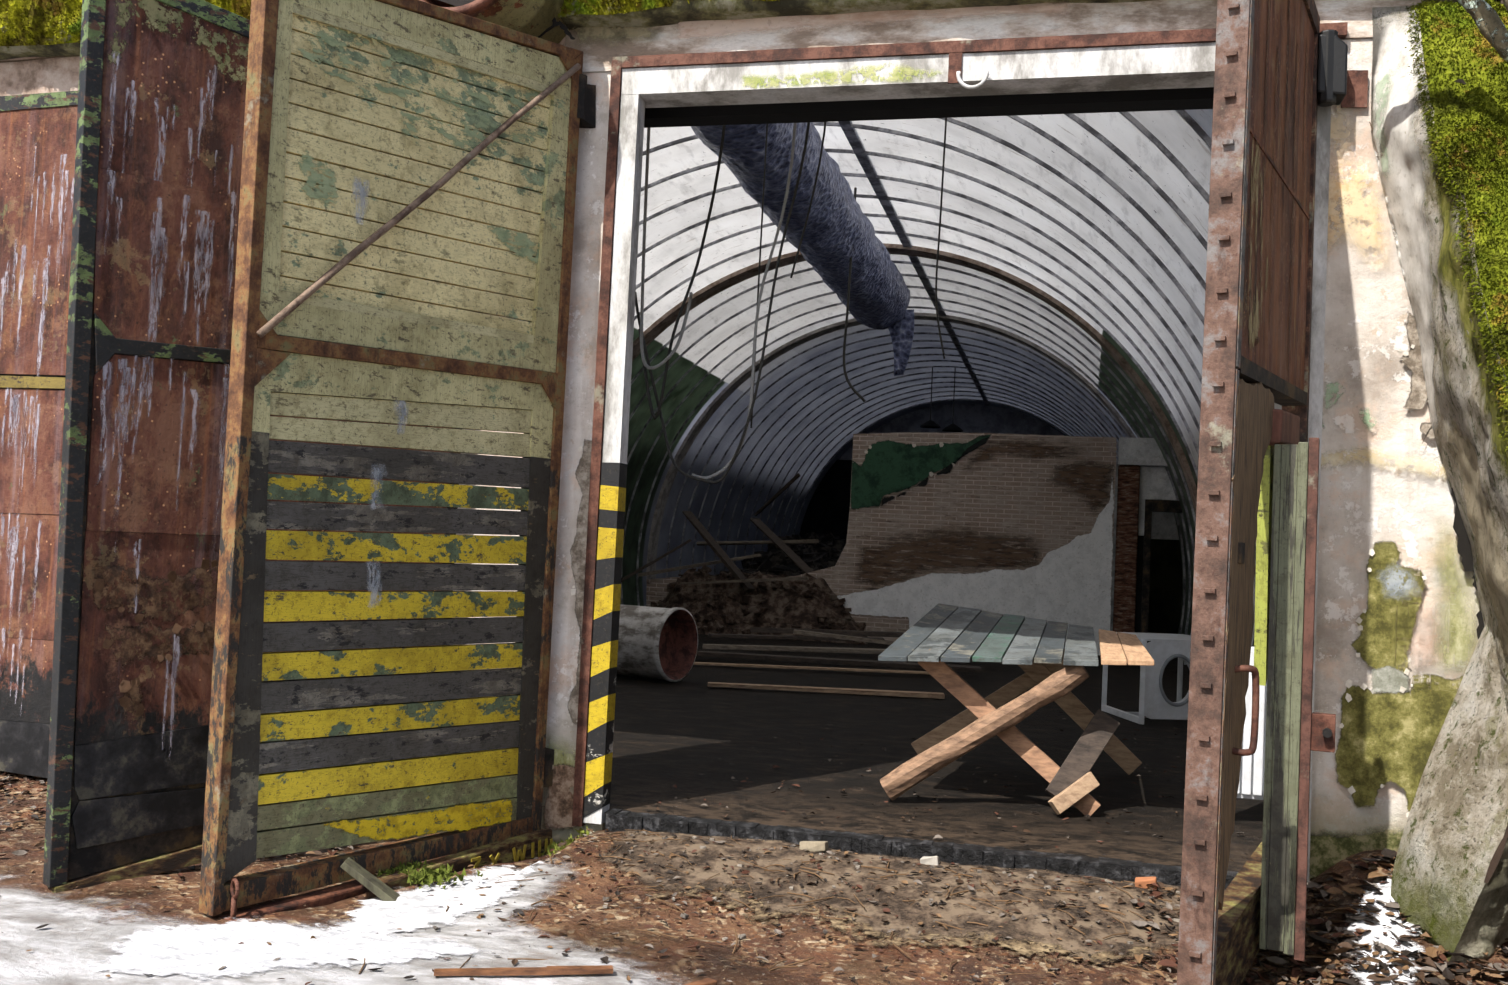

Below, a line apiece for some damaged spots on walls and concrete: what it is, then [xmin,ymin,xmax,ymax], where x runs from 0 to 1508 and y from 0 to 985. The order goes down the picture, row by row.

peeling [296,27,547,152]
peeling [298,150,339,204]
leakage [99,66,235,493]
peeling [487,225,540,265]
peeling [1371,21,1508,655]
peeling [851,434,992,509]
peeling [837,482,1114,655]
peeling [1335,541,1463,818]
spalling [1484,825,1508,883]